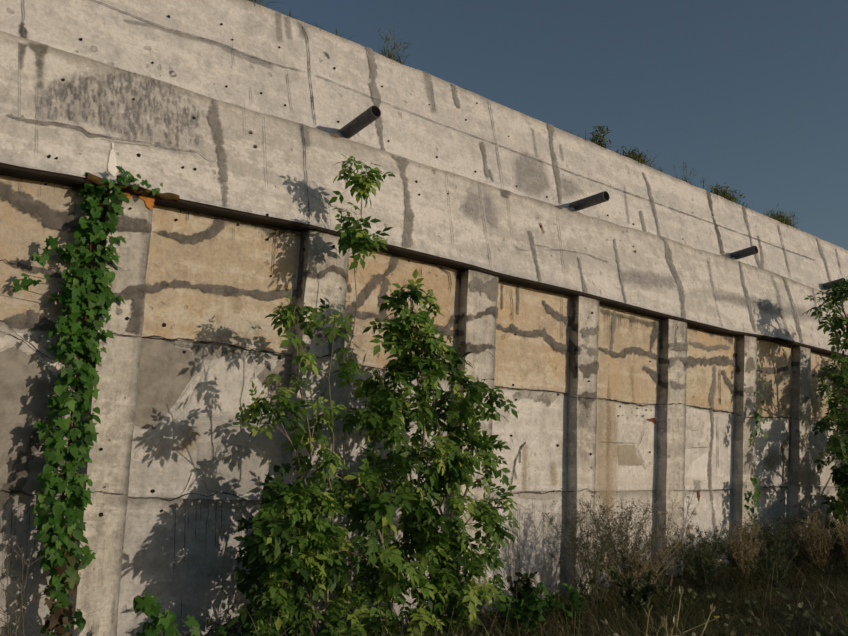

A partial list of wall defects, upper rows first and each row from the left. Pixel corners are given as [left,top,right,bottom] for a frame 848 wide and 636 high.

leakage [20,44,199,150]
rust [120,192,155,209]
crack [94,0,843,542]
peeling [0,327,60,379]
crack [501,488,599,560]